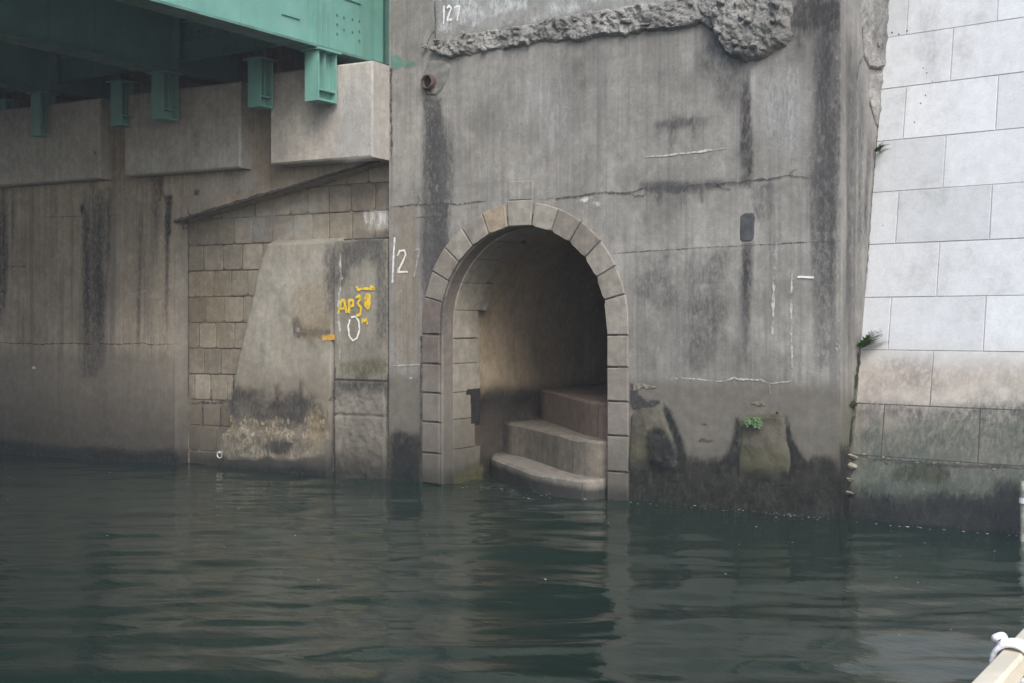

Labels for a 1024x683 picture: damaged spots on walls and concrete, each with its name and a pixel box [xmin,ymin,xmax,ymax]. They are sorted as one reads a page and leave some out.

spalling [422,0,794,63]
spalling [859,0,908,127]
damp [423,97,448,335]
crack [540,169,813,200]
damp [643,81,753,194]
damp [790,0,869,321]
damp [82,203,110,367]
damp [229,387,316,423]
crack [670,376,792,389]
damp [630,456,843,520]